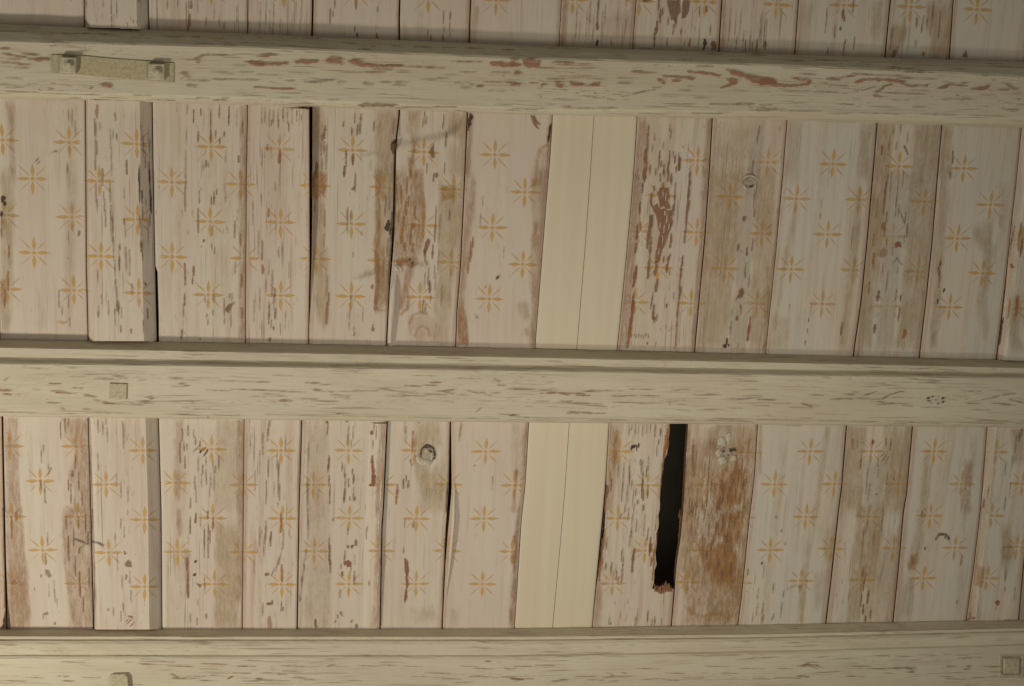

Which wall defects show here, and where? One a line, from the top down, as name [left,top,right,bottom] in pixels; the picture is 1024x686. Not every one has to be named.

peeling [617,66,1018,108]
peeling [622,124,691,349]
leakage [683,443,750,622]